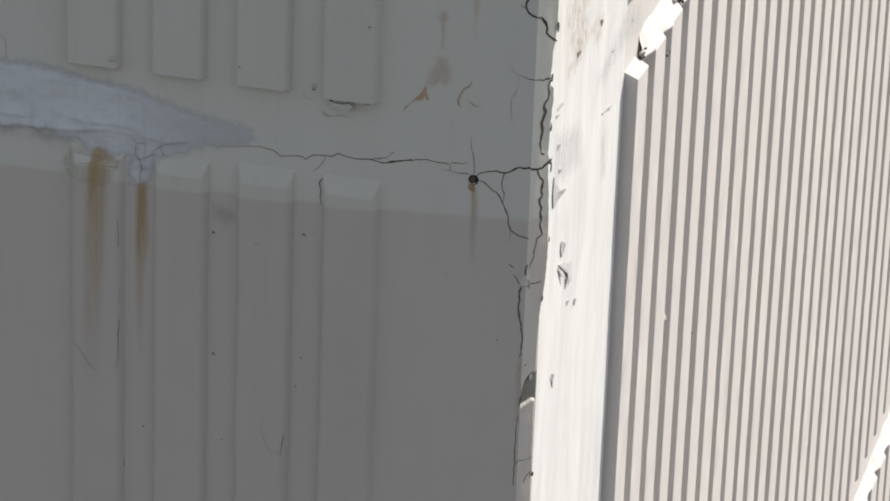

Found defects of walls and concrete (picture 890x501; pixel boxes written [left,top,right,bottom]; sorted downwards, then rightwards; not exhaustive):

crack [519,0,557,41]
crack [223,69,551,357]
spalling [518,372,536,405]
crack [513,417,531,485]